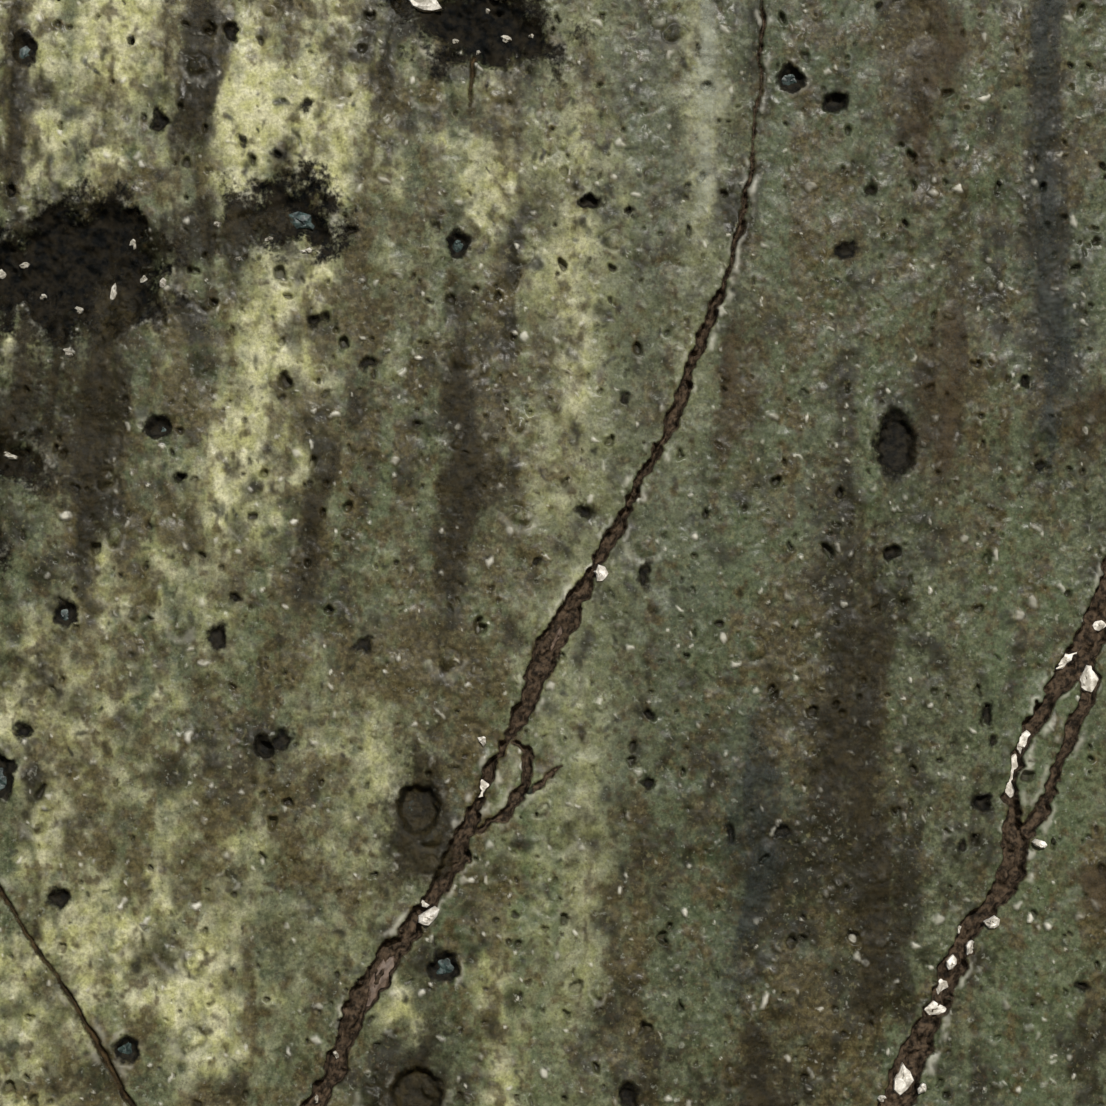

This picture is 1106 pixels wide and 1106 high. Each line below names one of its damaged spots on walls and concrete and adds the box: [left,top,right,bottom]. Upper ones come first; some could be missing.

damp [0,274,135,558]
crack [300,0,766,1106]
crack [0,886,136,1106]
crack [877,557,1106,1106]